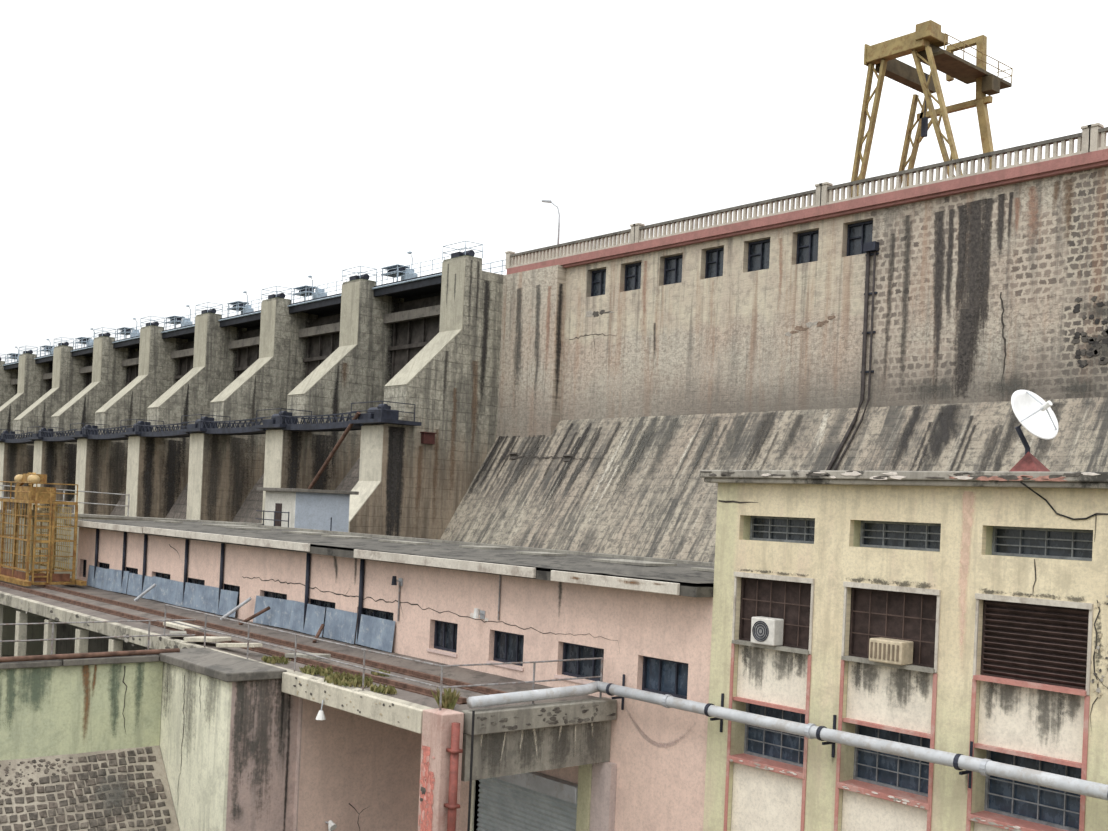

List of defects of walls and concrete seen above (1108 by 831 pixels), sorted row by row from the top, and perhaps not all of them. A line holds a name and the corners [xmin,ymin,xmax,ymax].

leakage [892,192,1014,471]
spalling [1071,296,1108,368]
leakage [989,379,1028,398]
leakage [979,414,1021,471]
leakage [1034,438,1048,459]
leakage [742,645,805,681]
leakage [854,662,877,690]
leakage [890,668,928,703]
leakage [986,682,1021,717]
leakage [1037,689,1080,732]
peeling [418,746,435,831]